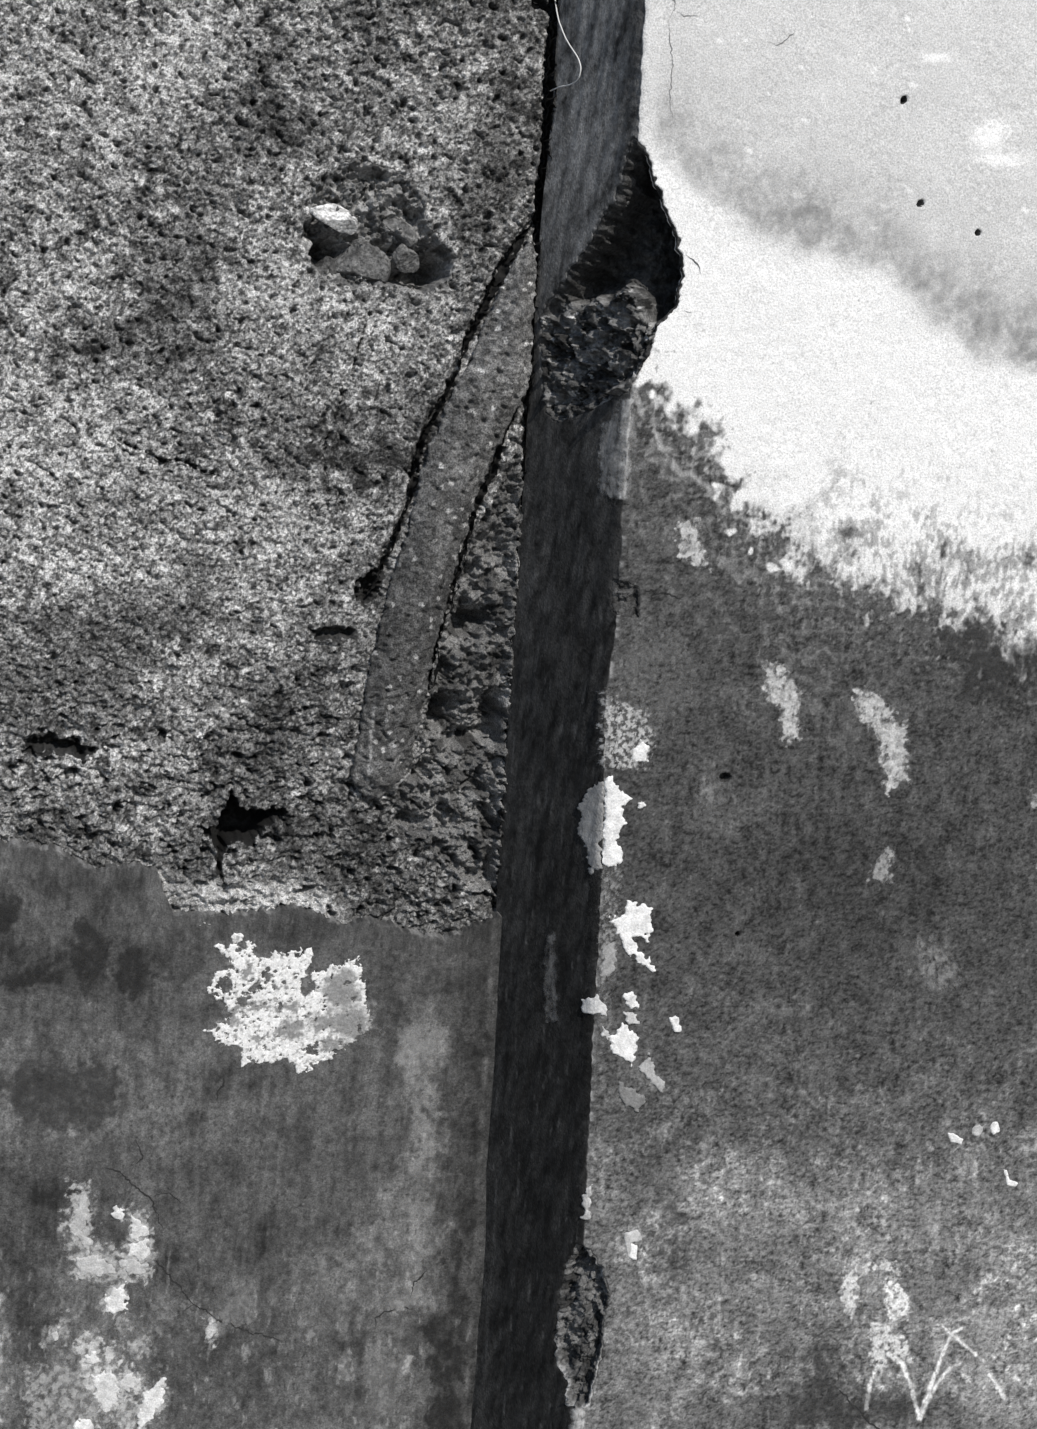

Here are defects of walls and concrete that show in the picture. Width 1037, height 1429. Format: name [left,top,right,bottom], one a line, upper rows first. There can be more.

spalling [298,158,458,294]
leakage [757,203,856,244]
spalling [538,137,685,499]
leakage [917,269,1037,360]
crack [116,439,221,476]
crack [323,311,372,493]
crack [367,0,561,902]
peeling [577,579,696,1112]
leakage [2,921,151,998]
peeling [203,933,385,1074]
leakage [7,1055,122,1132]
peeling [0,1178,177,1429]